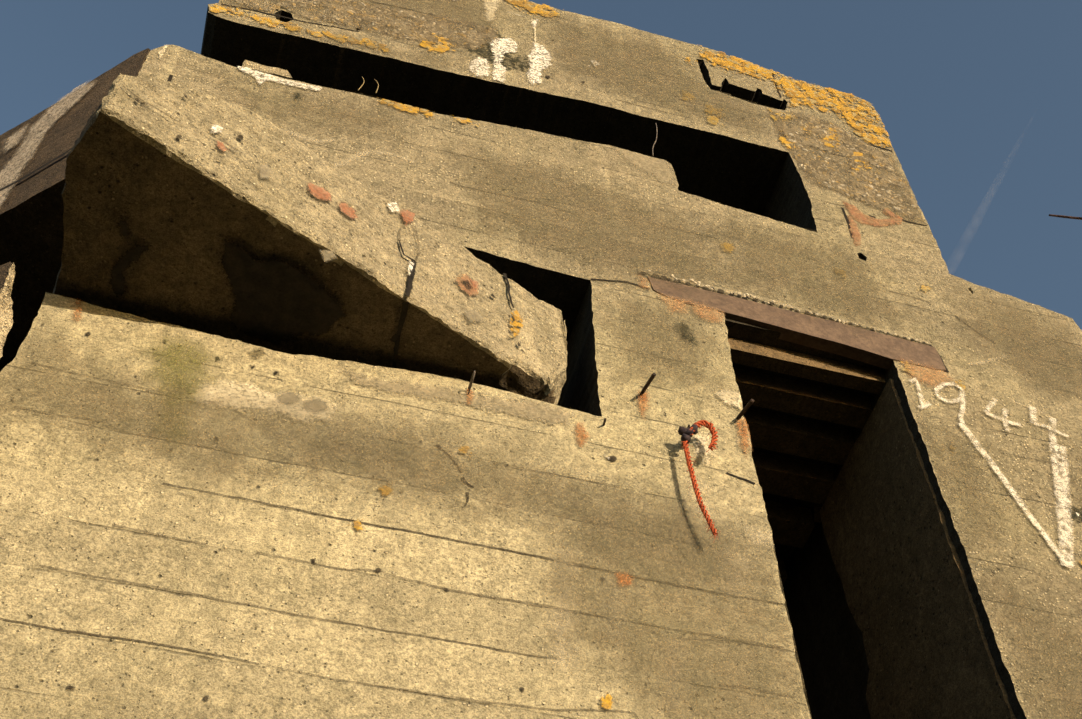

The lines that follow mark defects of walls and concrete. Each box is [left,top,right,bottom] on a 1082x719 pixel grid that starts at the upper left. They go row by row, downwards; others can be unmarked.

crack [0,263,15,358]
crack [435,444,474,506]
rust [737,419,750,450]
crack [112,524,207,544]
crack [39,565,560,659]
crack [0,618,639,719]